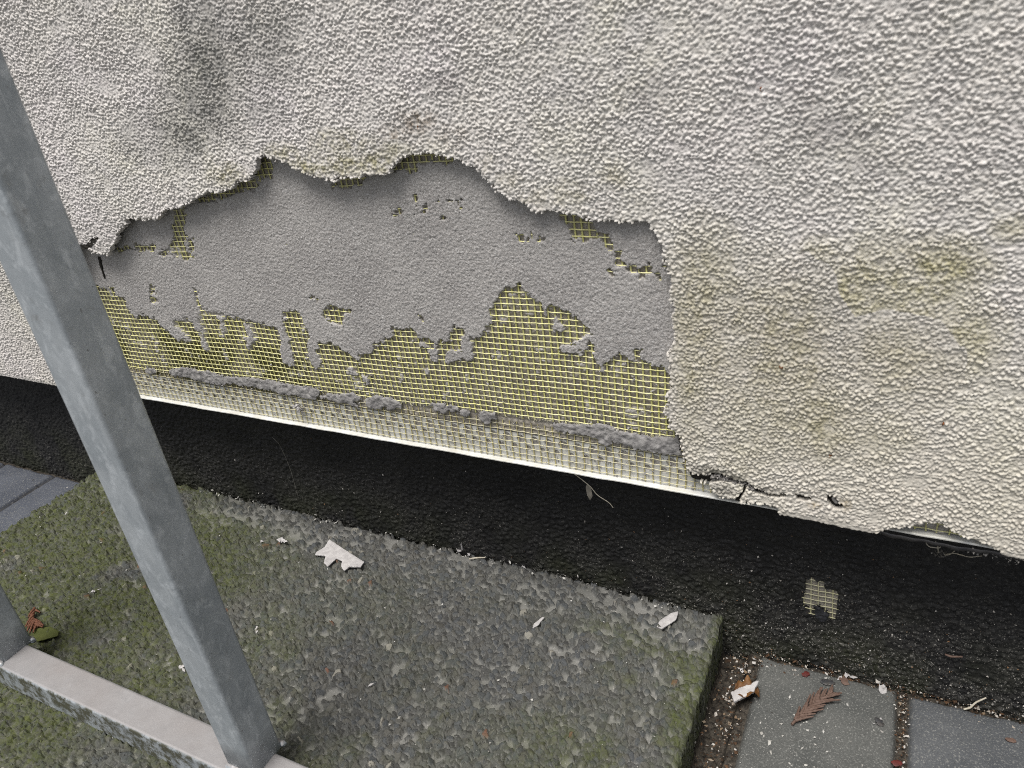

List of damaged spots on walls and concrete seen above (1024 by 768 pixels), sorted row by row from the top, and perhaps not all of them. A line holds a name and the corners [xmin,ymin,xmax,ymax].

flaking render [82,153,767,493]
crack [690,472,784,501]
flaking render [879,522,1024,562]
peeling [802,577,838,622]